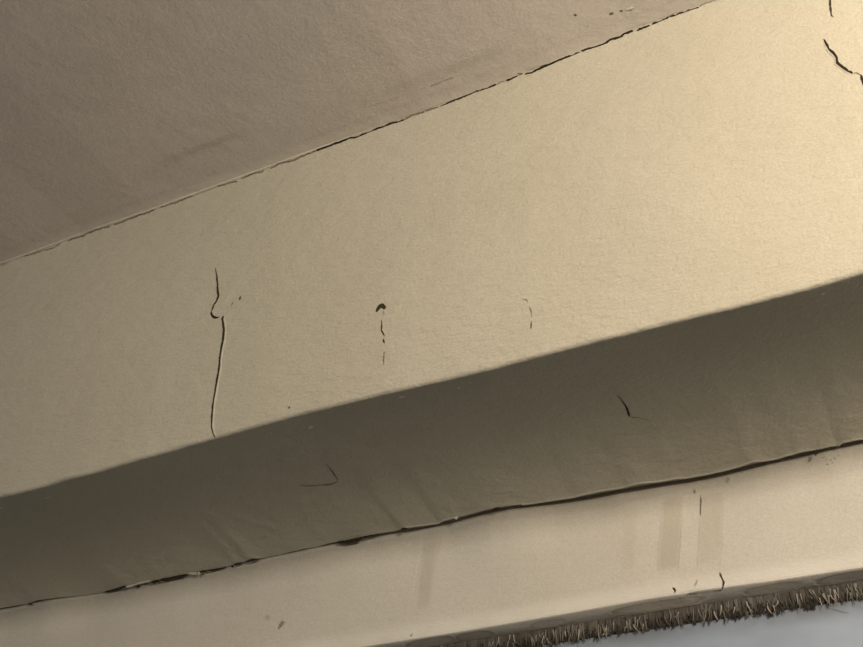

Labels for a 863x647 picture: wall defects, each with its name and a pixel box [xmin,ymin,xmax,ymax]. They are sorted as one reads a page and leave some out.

crack [822,39,863,84]
crack [218,7,699,186]
crack [26,196,193,256]
crack [210,267,241,437]
crack [337,534,379,544]
crack [105,558,259,592]